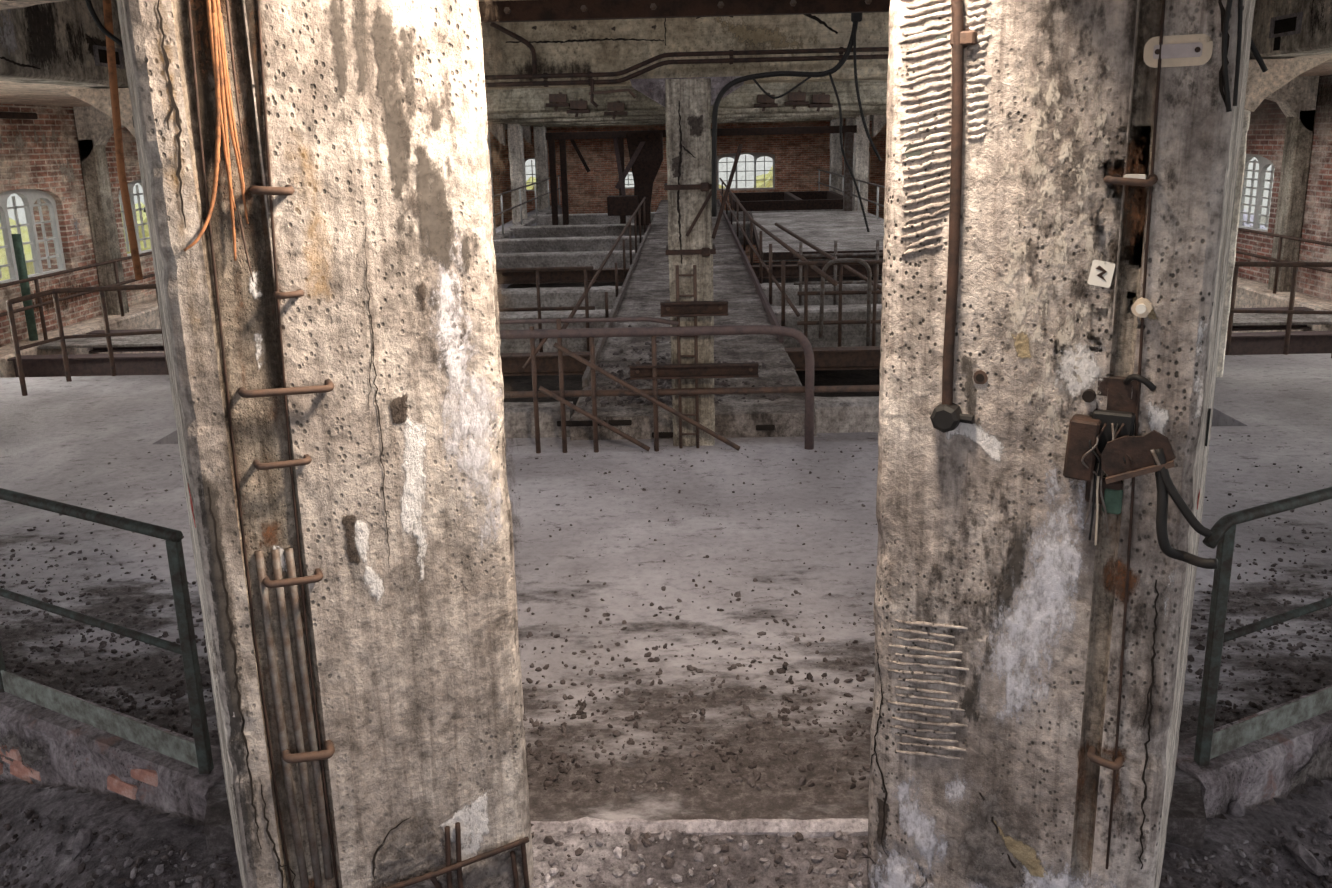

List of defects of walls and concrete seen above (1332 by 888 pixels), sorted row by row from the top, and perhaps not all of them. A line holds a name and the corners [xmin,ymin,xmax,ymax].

corrosion [1110,144,1146,245]
spalling [417,282,427,310]
water stain [330,0,520,551]
peeling [1044,331,1121,398]
peeling [1146,402,1169,435]
peeling [390,393,428,580]
corrosion [260,523,278,547]
peeling [342,515,385,602]
spalling [373,818,530,888]
spalling [877,798,889,849]
spalling [958,790,1052,888]